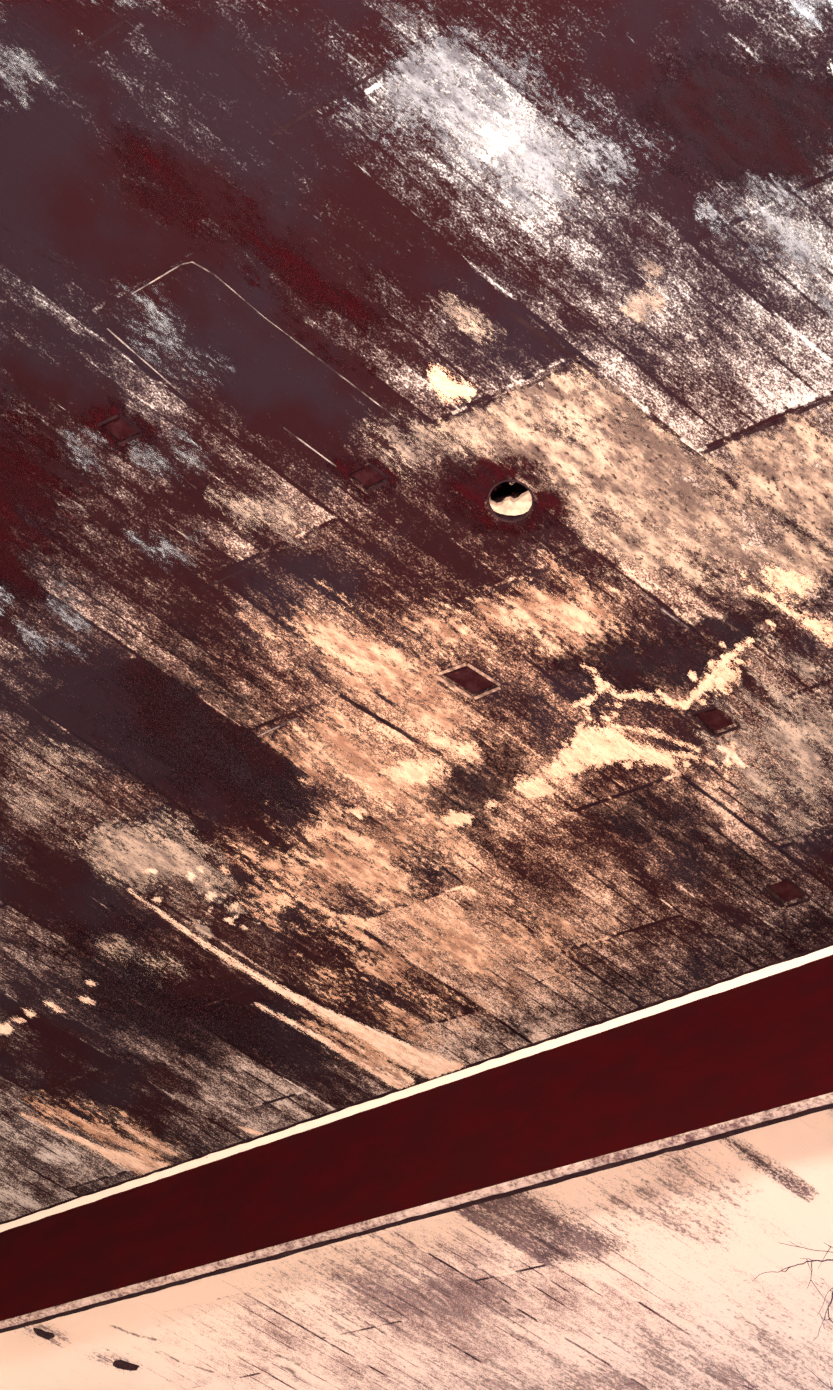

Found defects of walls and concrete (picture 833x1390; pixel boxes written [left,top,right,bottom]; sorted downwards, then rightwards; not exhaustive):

water stain [84,623,327,836]
peeling [77,980,99,1005]
peeling [0,1000,67,1037]